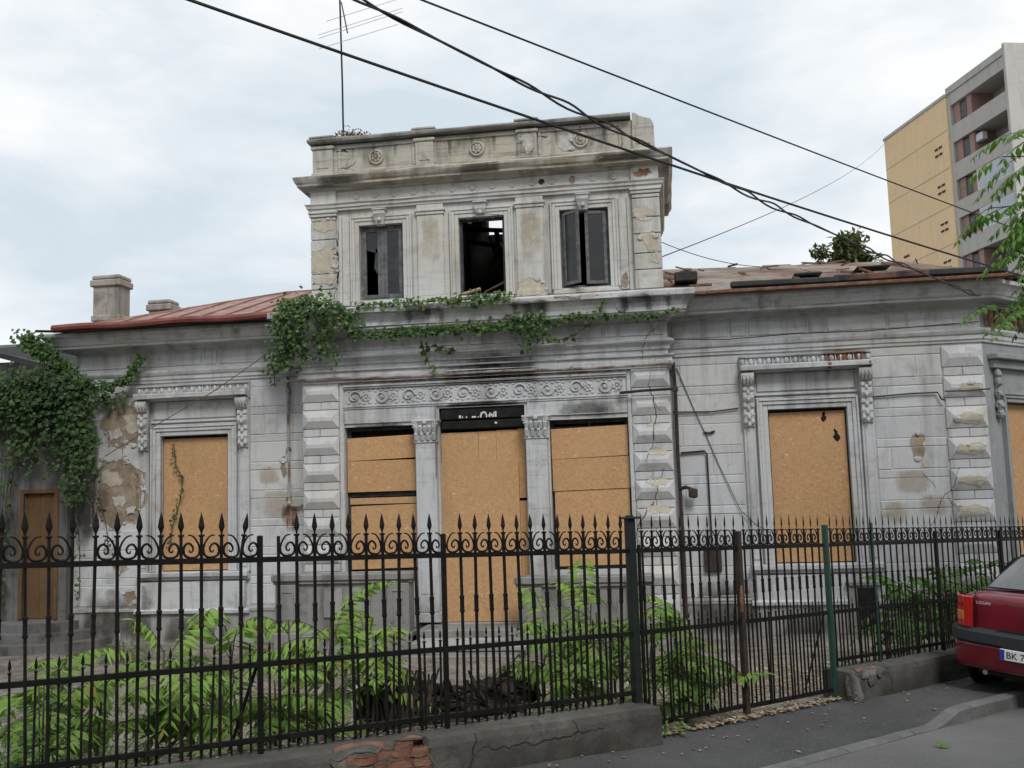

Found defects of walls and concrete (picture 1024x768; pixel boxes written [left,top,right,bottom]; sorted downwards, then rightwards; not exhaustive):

peeling [312,246,340,285]
peeling [94,400,150,532]
crack [636,324,665,538]
peeling [910,431,930,467]
peeling [956,442,987,455]
spalling [846,663,886,704]
crack [469,721,604,768]